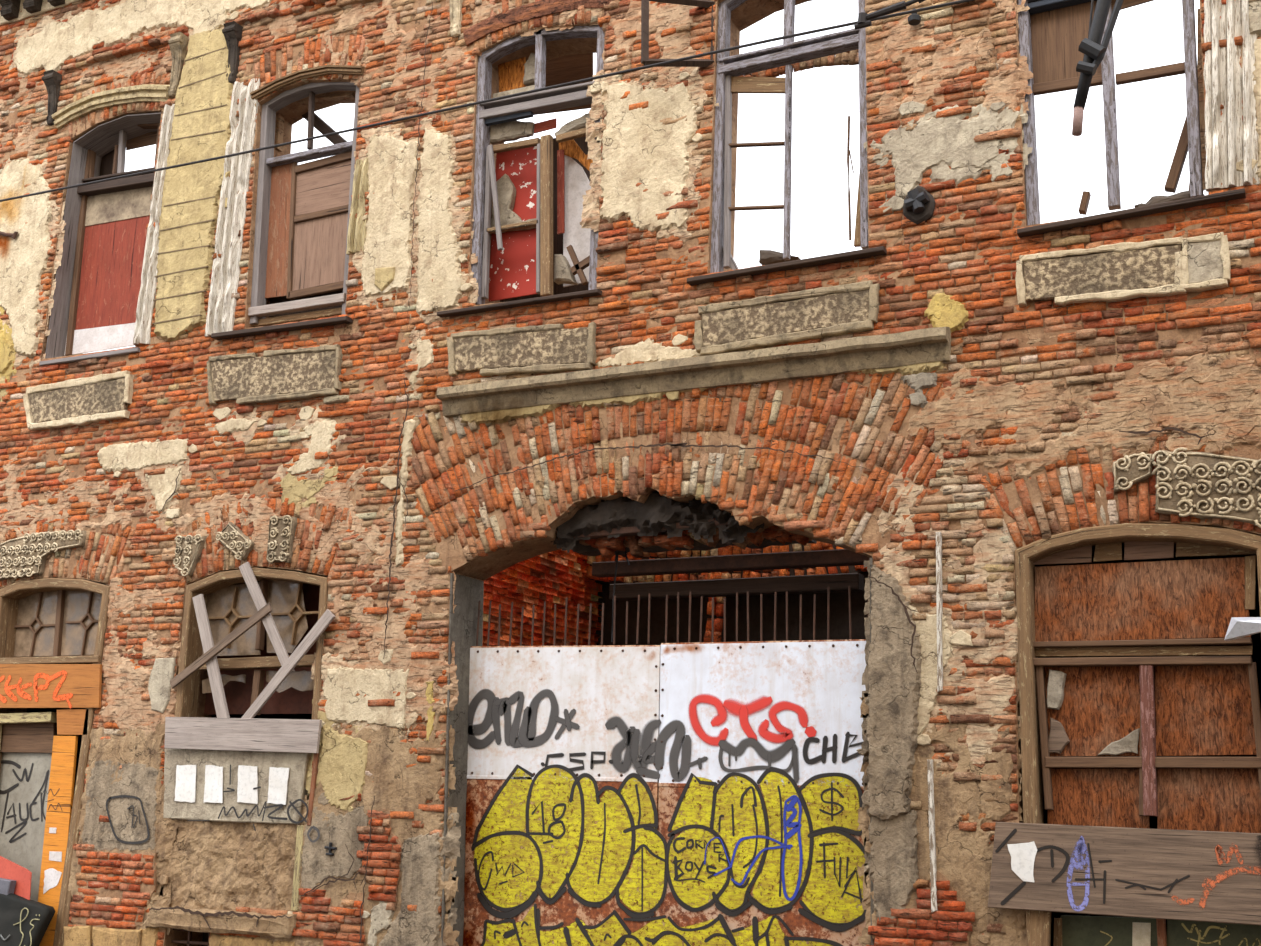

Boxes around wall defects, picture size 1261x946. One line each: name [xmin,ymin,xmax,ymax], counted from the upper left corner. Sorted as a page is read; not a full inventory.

flaking render [0,154,66,408]
flaking render [8,0,290,342]
flaking render [352,117,479,401]
flaking render [580,67,719,243]
flaking render [863,101,1033,216]
flaking render [97,407,268,528]
crack [383,379,409,659]
flaking render [380,419,419,567]
spalling [551,491,764,553]
spalling [68,658,178,946]
flaking render [209,649,461,946]
flaking render [857,601,1027,946]